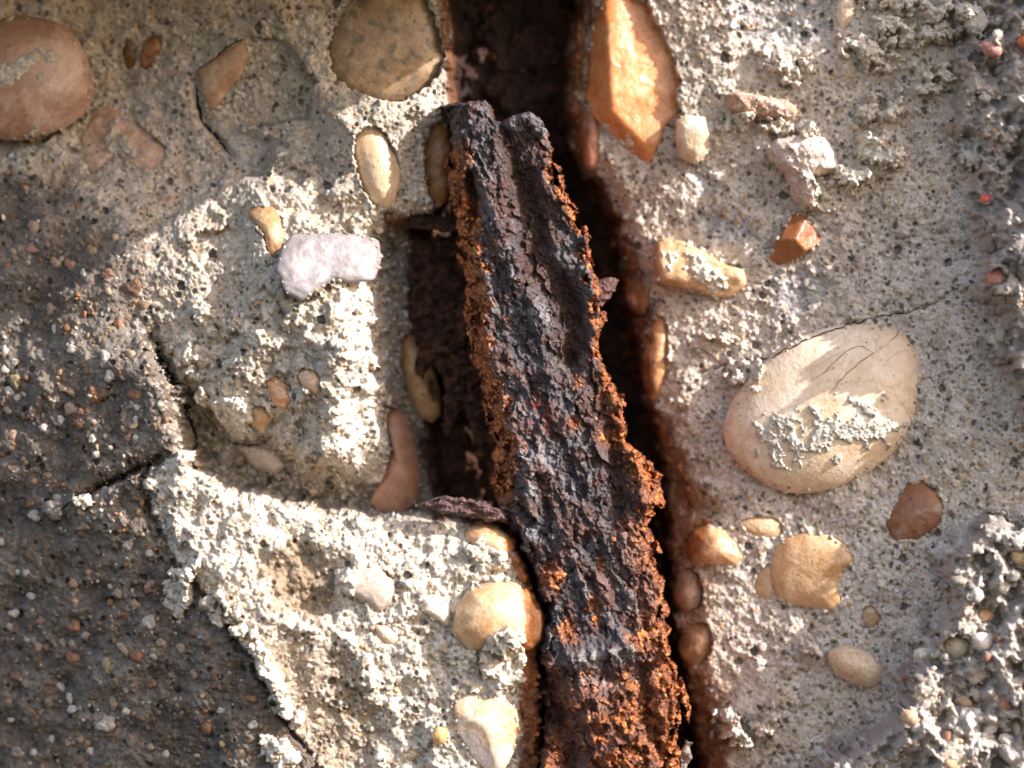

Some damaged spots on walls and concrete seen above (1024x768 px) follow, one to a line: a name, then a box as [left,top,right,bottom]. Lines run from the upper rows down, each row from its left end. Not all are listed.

crack [55,458,159,526]
spalling [0,0,526,768]
rust [440,0,458,103]
rust [384,125,546,768]
rust [541,0,730,768]
crack [682,287,960,394]